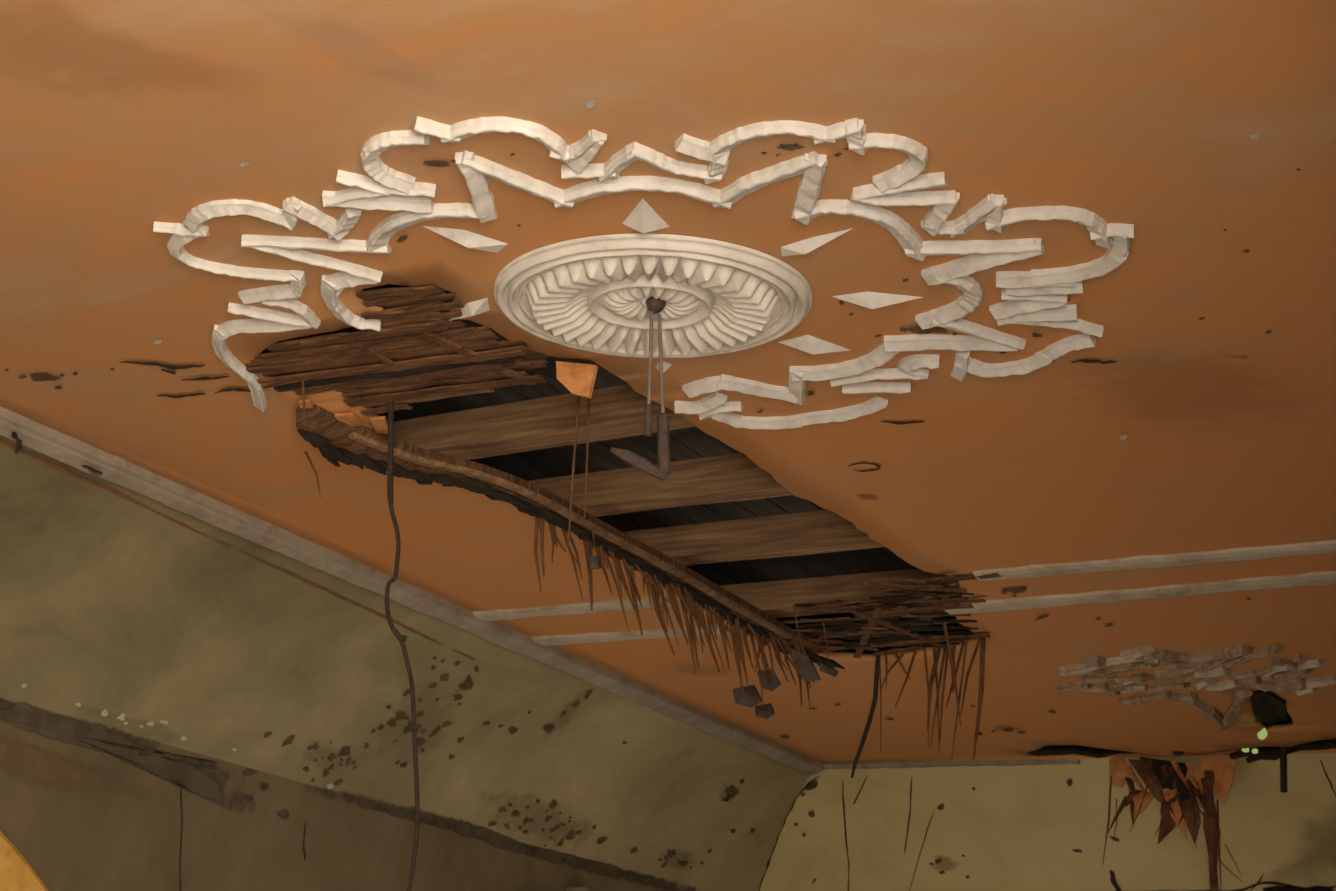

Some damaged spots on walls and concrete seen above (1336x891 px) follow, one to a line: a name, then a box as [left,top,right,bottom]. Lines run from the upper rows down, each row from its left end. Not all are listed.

peeling [556,361,598,398]
peeling [335,412,388,434]
crack [1109,870,1121,891]
crack [1169,873,1336,891]